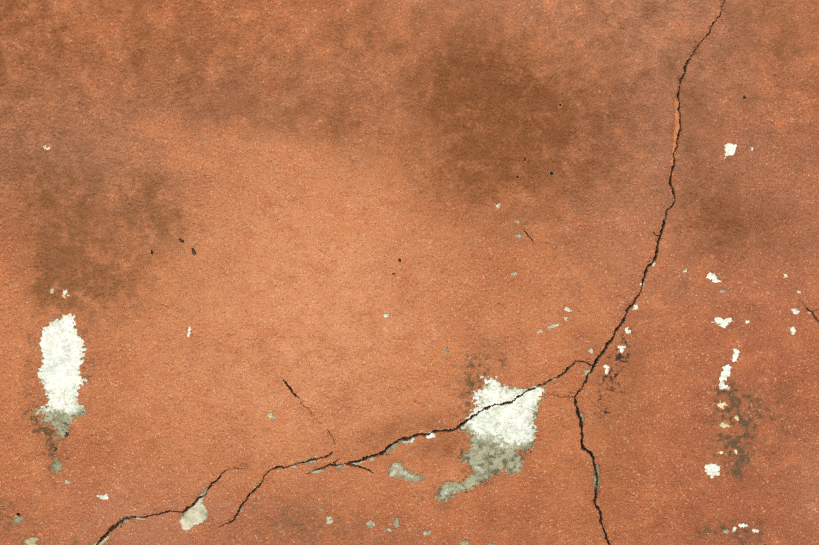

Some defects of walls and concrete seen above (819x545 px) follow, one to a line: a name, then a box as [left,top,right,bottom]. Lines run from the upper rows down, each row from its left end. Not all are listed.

crack [93,0,725,545]
flaking render [31,312,88,483]
flaking render [434,373,547,503]